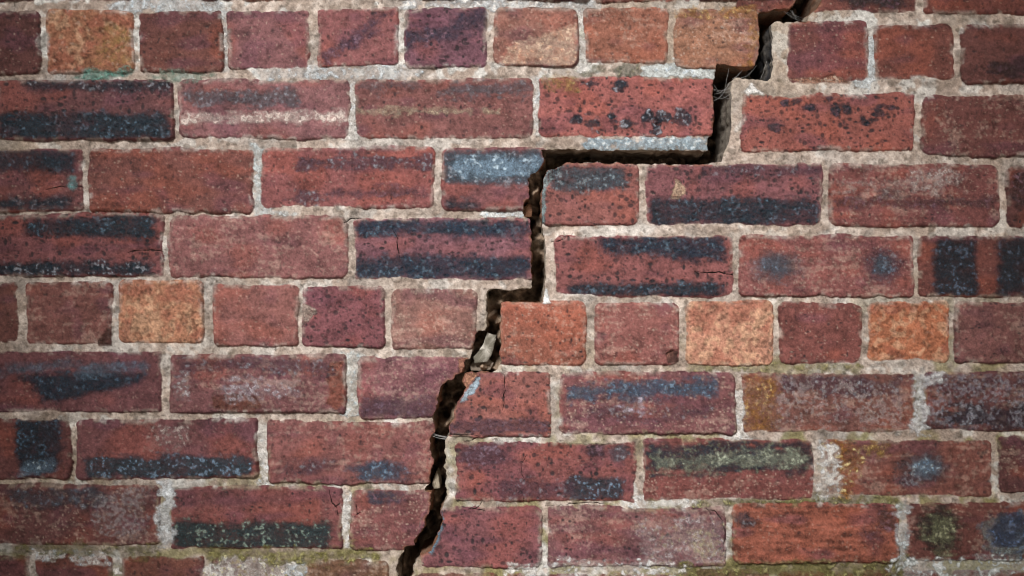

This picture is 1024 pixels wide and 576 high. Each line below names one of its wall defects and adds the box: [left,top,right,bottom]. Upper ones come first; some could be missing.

crack [396,0,822,576]